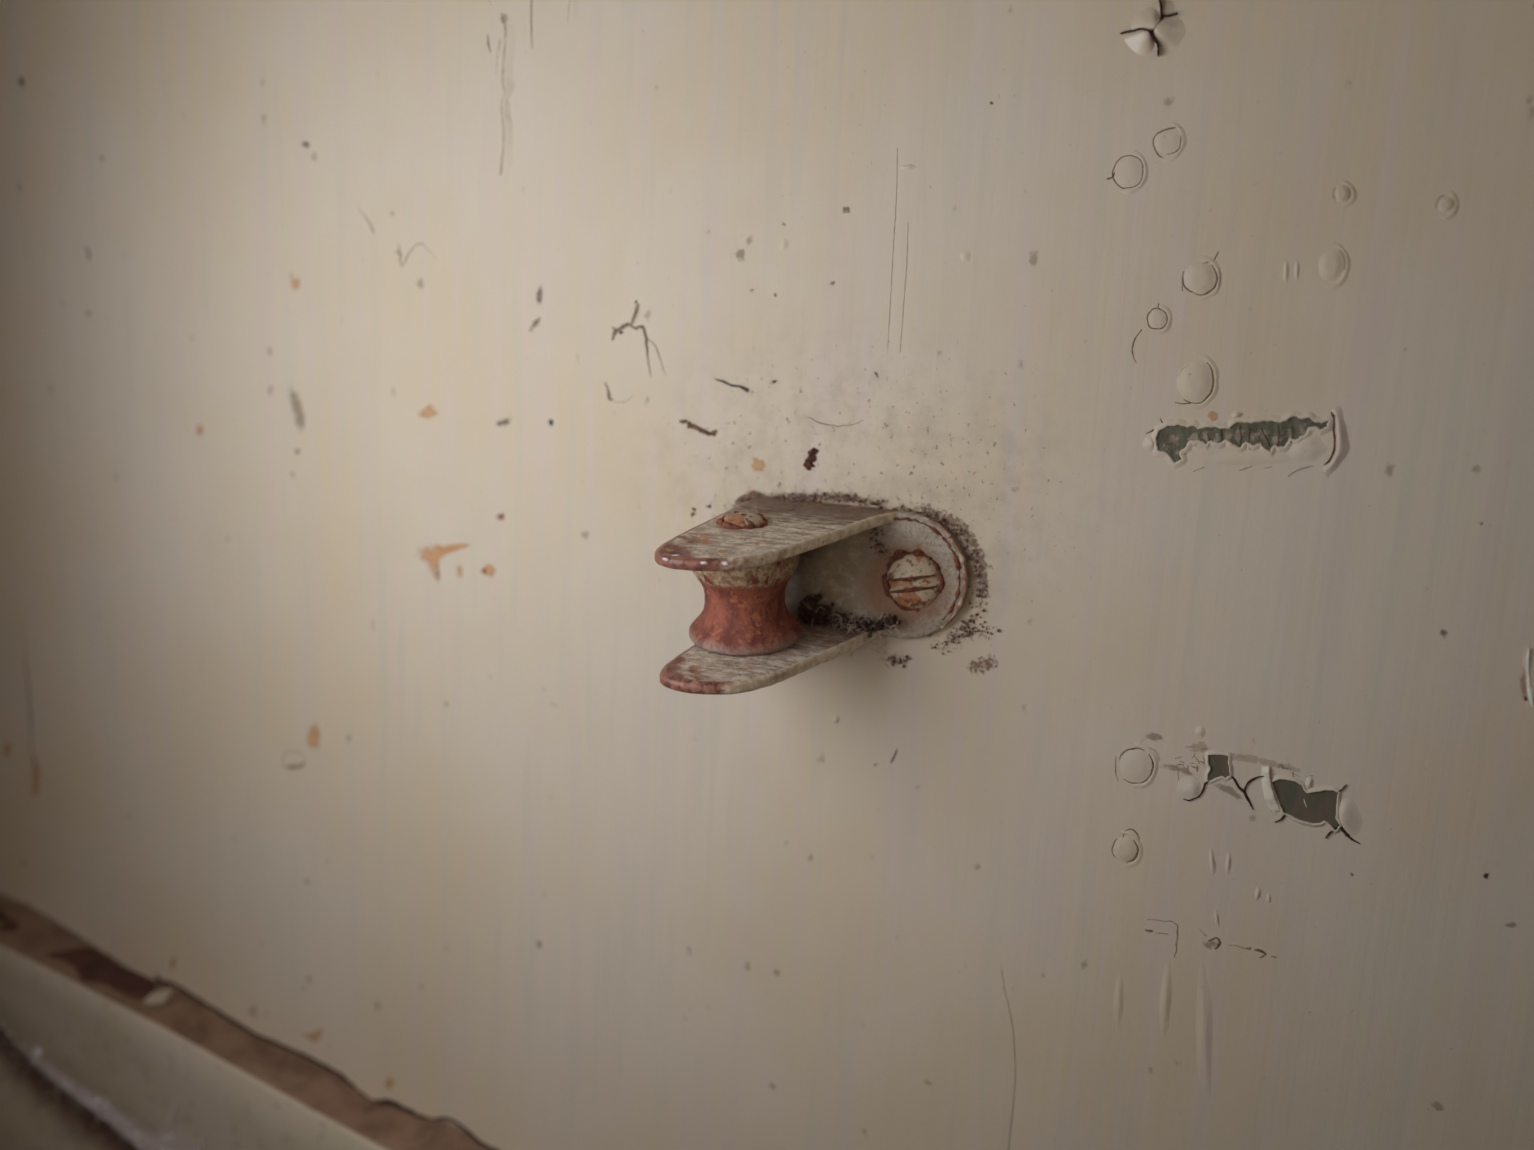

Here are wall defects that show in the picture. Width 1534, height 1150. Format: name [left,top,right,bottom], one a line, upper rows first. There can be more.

crack [1120,0,1186,57]
peeling [1142,405,1350,478]
rust [716,491,768,530]
rust [881,549,945,611]
peeling [1175,725,1363,844]
peeling [43,946,181,1010]